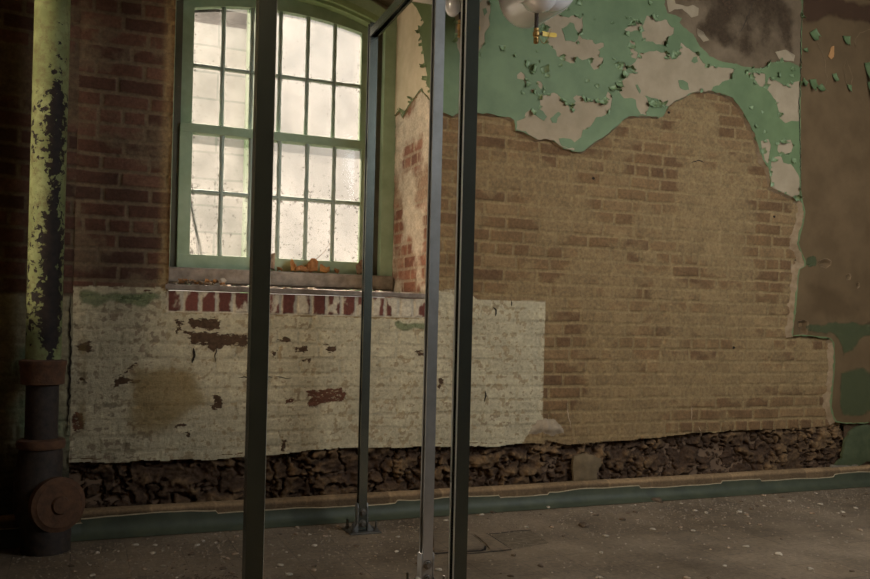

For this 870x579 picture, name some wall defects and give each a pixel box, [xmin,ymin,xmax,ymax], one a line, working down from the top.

leakage [700,0,791,52]
peeling [394,3,430,182]
spalling [439,113,459,290]
spalling [468,0,870,498]
peeling [172,317,248,352]
peeling [272,336,311,363]
peeling [210,395,223,410]
peeling [304,387,346,408]
spalling [69,452,245,520]
spalling [265,439,422,511]
spalling [434,443,451,499]